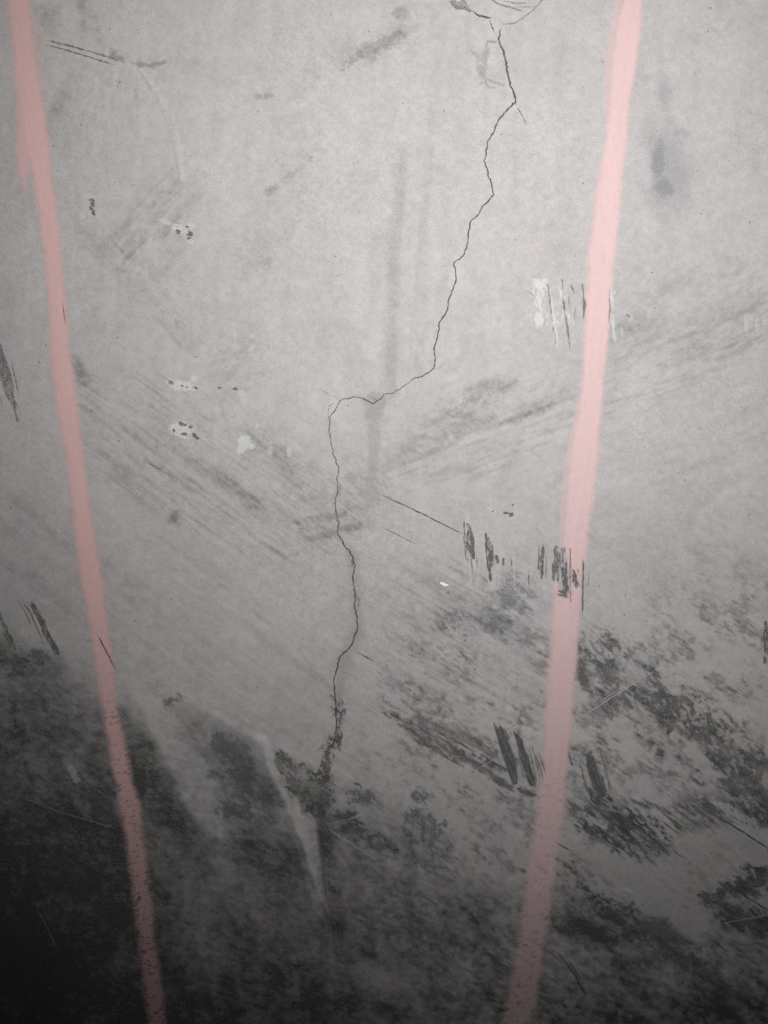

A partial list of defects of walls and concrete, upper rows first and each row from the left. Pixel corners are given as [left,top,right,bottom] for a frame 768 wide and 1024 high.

crack [325,0,540,765]